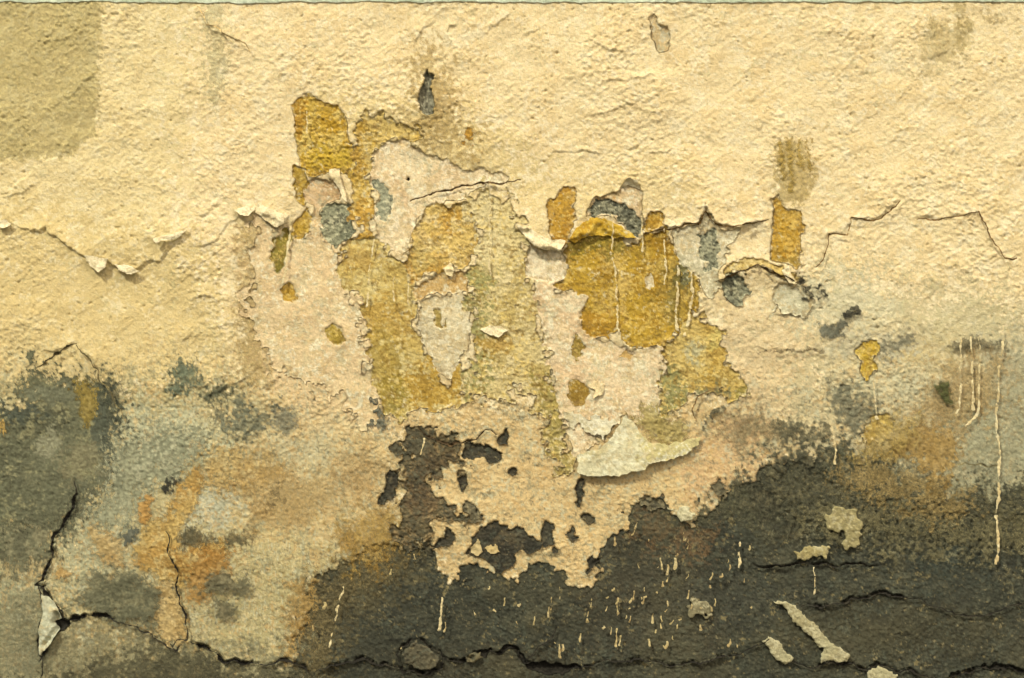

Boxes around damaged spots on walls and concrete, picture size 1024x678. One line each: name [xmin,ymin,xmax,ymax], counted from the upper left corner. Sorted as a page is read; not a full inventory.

spalling [649,14,670,53]
crack [716,201,1017,284]
water stain [0,350,426,678]
crack [34,481,769,678]
peeling [234,70,1024,678]
water stain [686,371,1024,559]